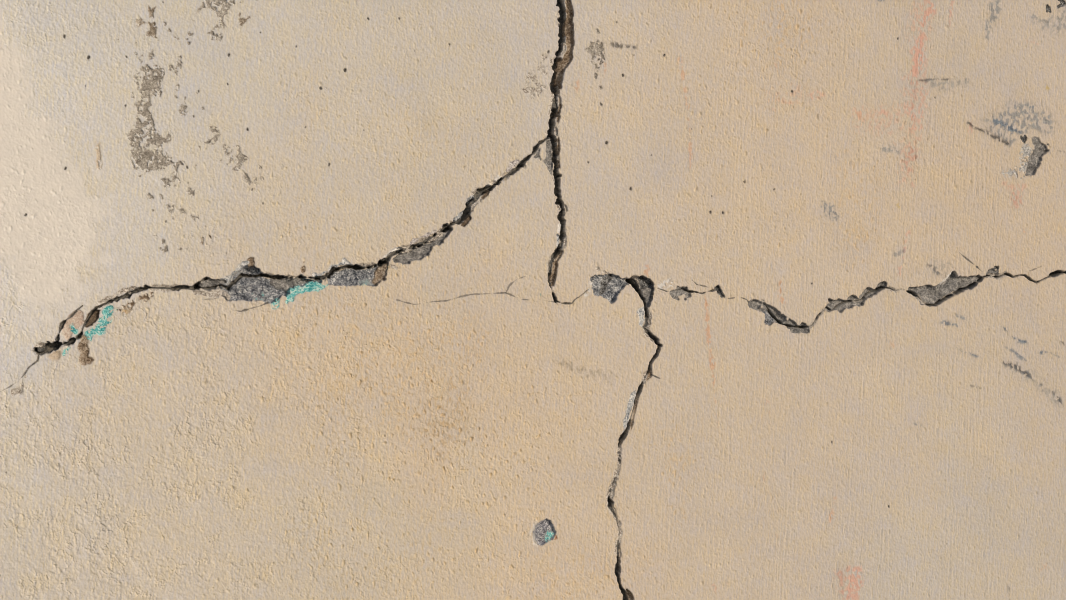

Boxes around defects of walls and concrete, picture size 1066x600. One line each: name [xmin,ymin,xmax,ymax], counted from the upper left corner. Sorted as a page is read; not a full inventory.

spalling [124,0,454,310]
crack [0,0,590,396]
spalling [1000,134,1050,180]
spalling [528,517,558,547]
crack [605,251,1066,600]